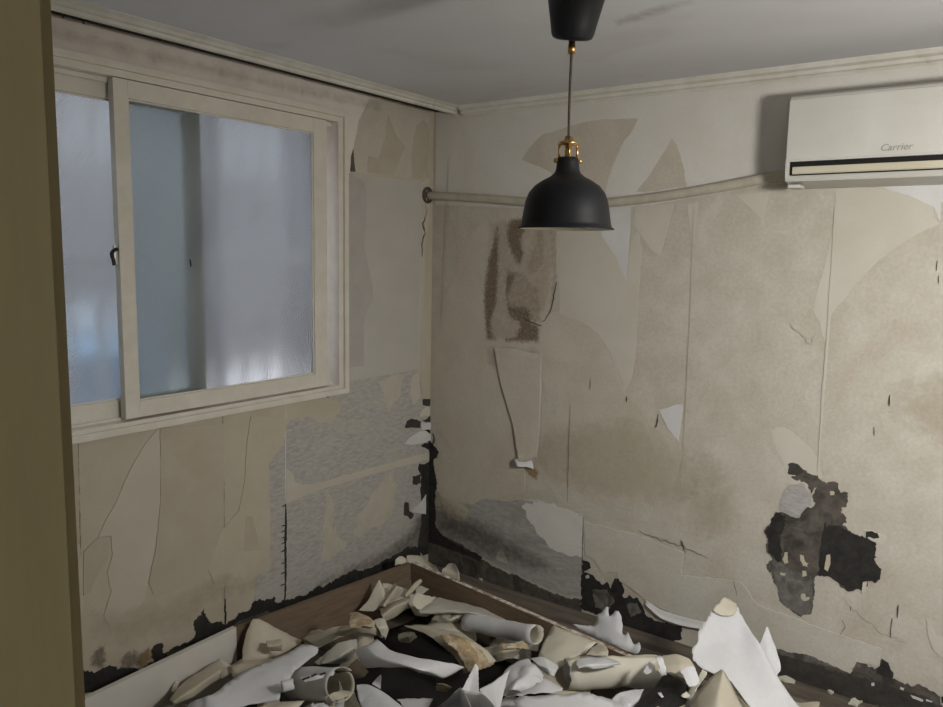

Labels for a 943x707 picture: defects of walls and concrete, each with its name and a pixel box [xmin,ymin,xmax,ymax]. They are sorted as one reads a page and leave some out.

leakage [484,220,524,338]
leakage [506,282,557,341]
peeling [83,399,704,693]
spalling [764,463,886,617]
peeling [776,649,943,707]